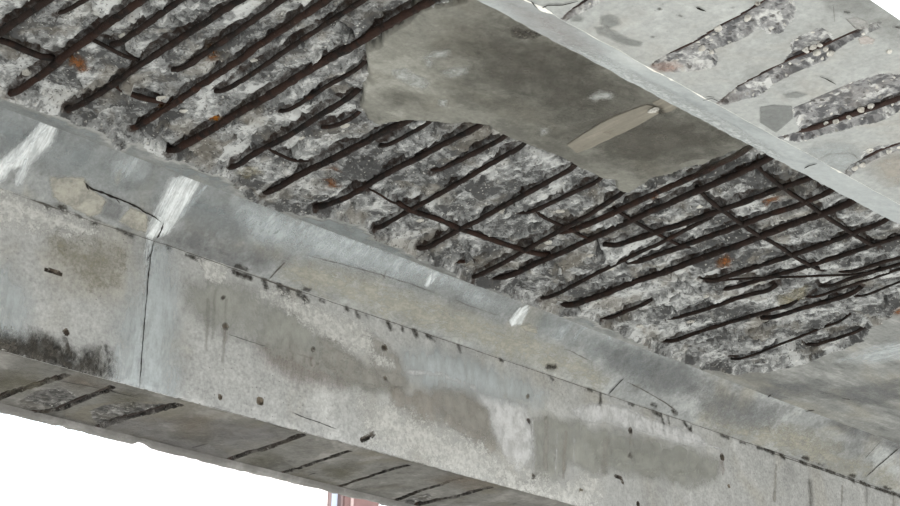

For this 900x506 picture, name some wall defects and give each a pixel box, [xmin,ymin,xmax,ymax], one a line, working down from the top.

spalling [0,373,184,428]
damp [0,165,437,394]
spalling [0,0,900,375]
crack [2,181,899,495]